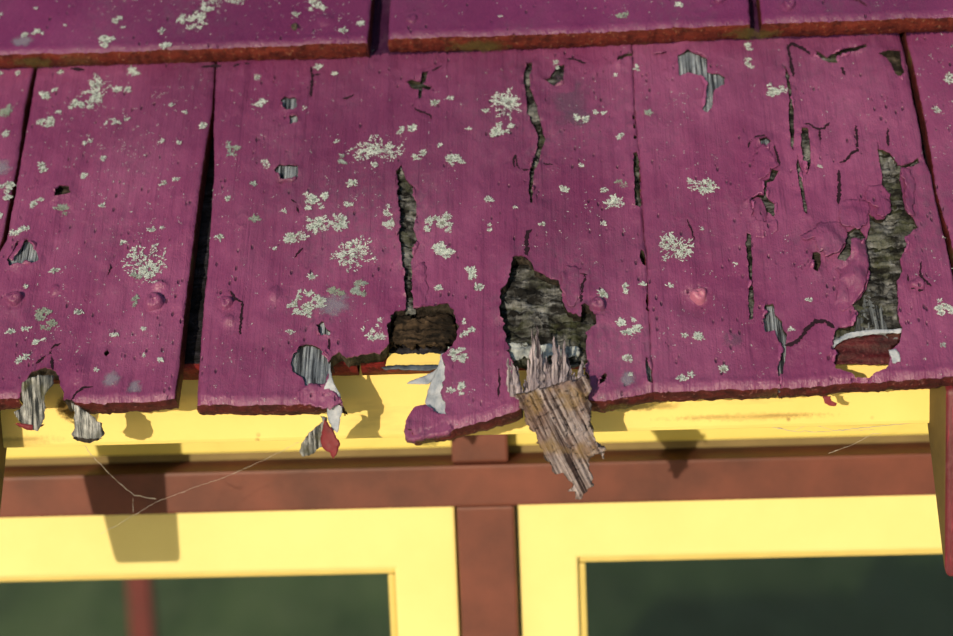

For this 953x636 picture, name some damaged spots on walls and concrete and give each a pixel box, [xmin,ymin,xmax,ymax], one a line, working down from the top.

peeling [678,51,725,112]
crack [512,154,553,171]
peeling [750,139,779,214]
peeling [900,167,916,216]
peeling [560,265,582,307]
peeling [800,184,902,365]
peeling [315,323,330,336]
peeling [761,303,786,393]
peeling [14,375,54,431]
peeling [71,403,105,443]
peeling [291,344,342,459]
peeling [404,353,453,444]